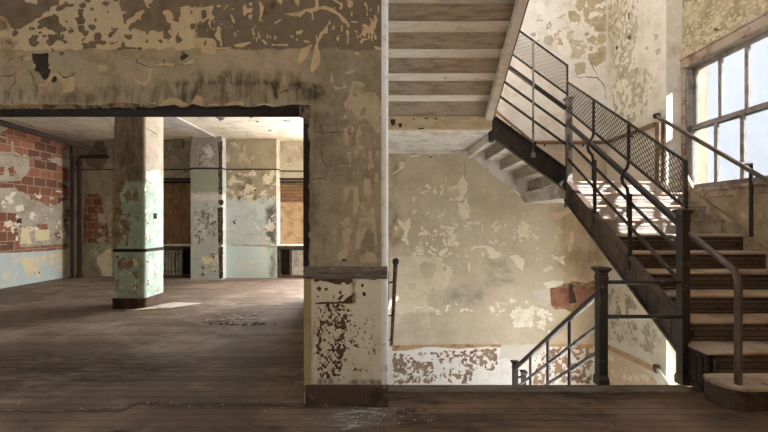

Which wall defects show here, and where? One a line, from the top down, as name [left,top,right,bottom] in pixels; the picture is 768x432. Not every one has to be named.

peeling [0,0,382,93]
peeling [522,0,653,123]
crack [573,56,606,99]
spalling [0,120,70,278]
spalling [83,117,301,297]
peeling [390,176,575,315]
peeling [313,279,377,380]
peeling [392,343,594,385]
spalling [488,280,595,333]
peeling [608,288,658,385]